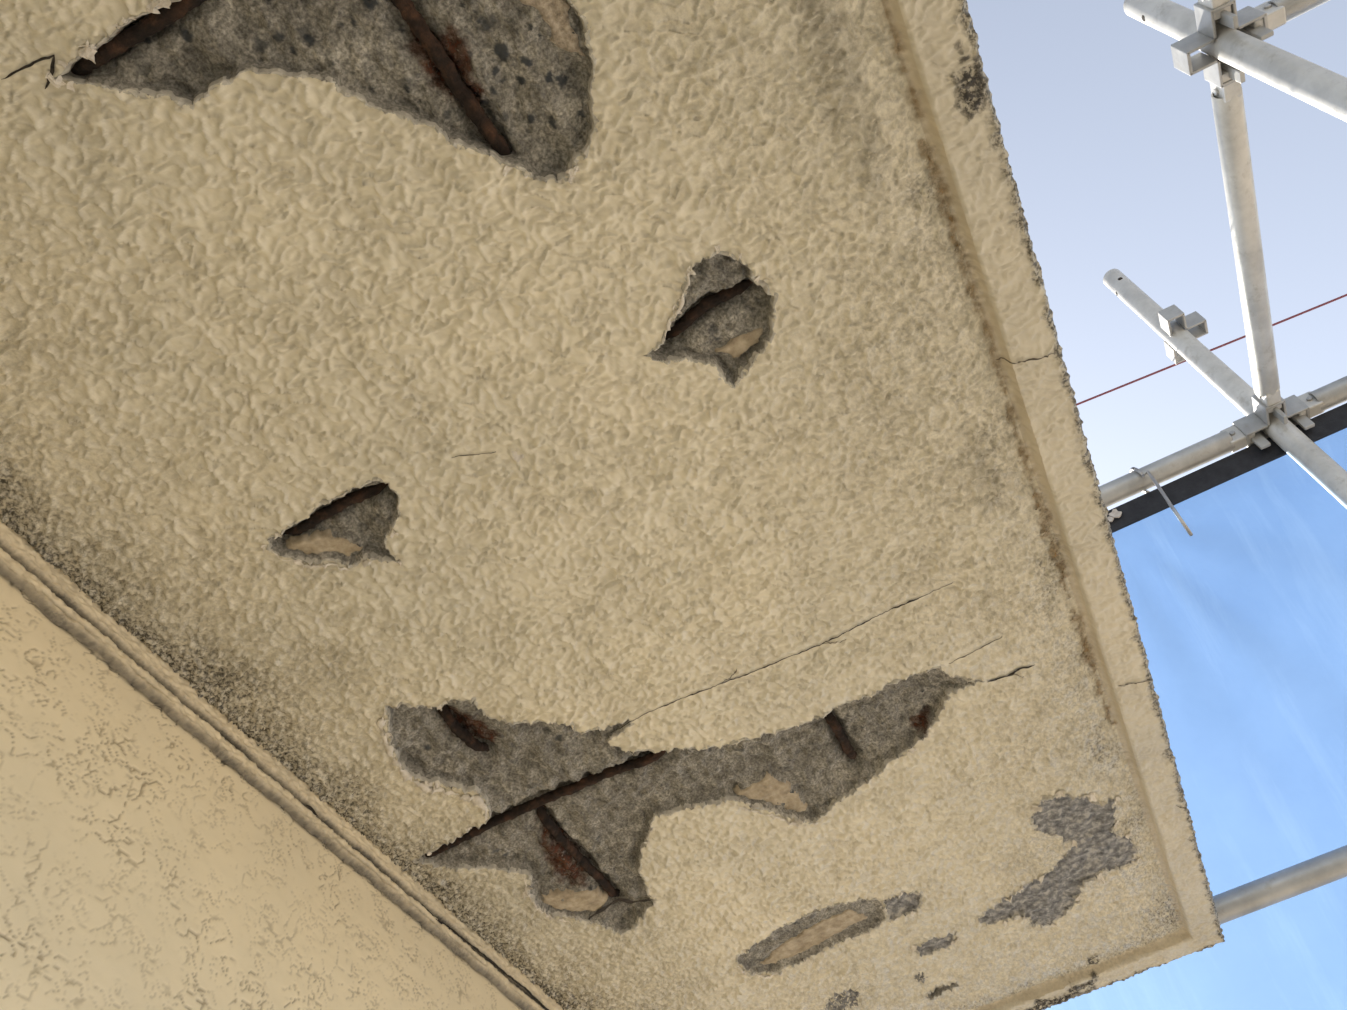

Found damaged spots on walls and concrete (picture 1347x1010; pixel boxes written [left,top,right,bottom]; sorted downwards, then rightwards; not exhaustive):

spalling [45,0,599,185]
corrosion [409,27,484,103]
spalling [643,245,779,389]
spalling [261,476,402,571]
corrosion [448,706,499,742]
corrosion [538,805,591,887]
spalling [376,666,985,935]
peeling [977,790,1140,929]
spalling [735,890,924,979]